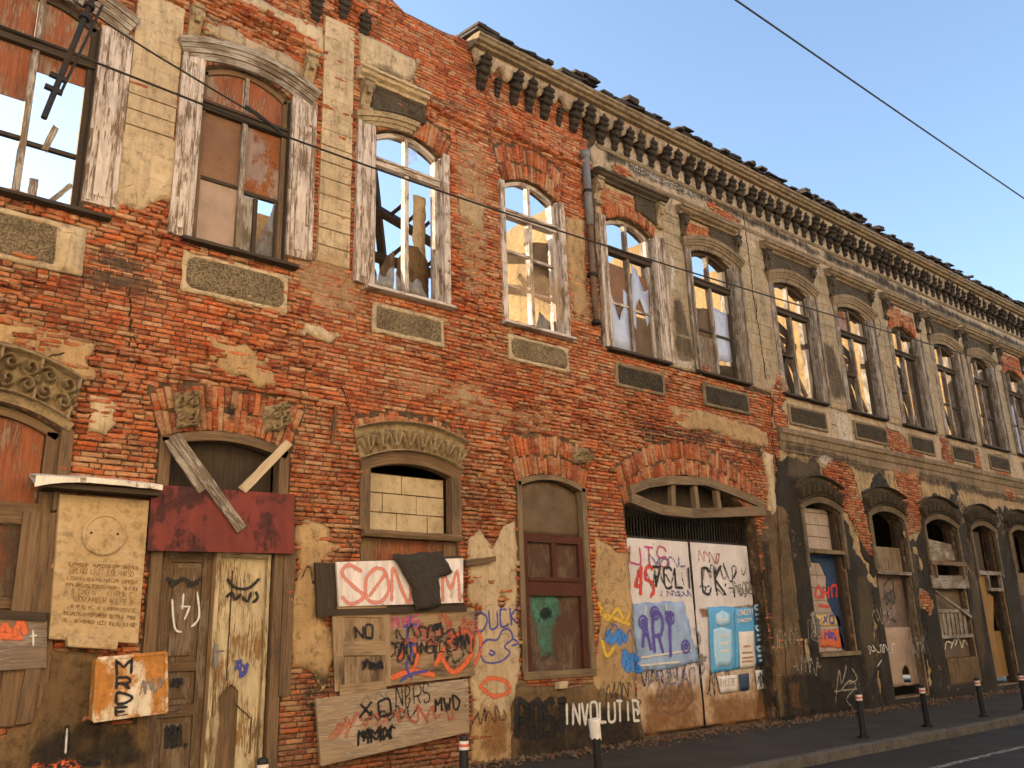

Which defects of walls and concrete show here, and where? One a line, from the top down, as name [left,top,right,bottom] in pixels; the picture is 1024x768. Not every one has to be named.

peeling [0,320,97,382]
peeling [206,336,276,389]
peeling [300,323,339,344]
crack [709,195,766,379]
flaking render [1000,354,1020,374]
peeling [291,519,340,692]
peeling [466,522,646,764]
leakage [755,526,857,721]
peeling [667,374,1024,717]